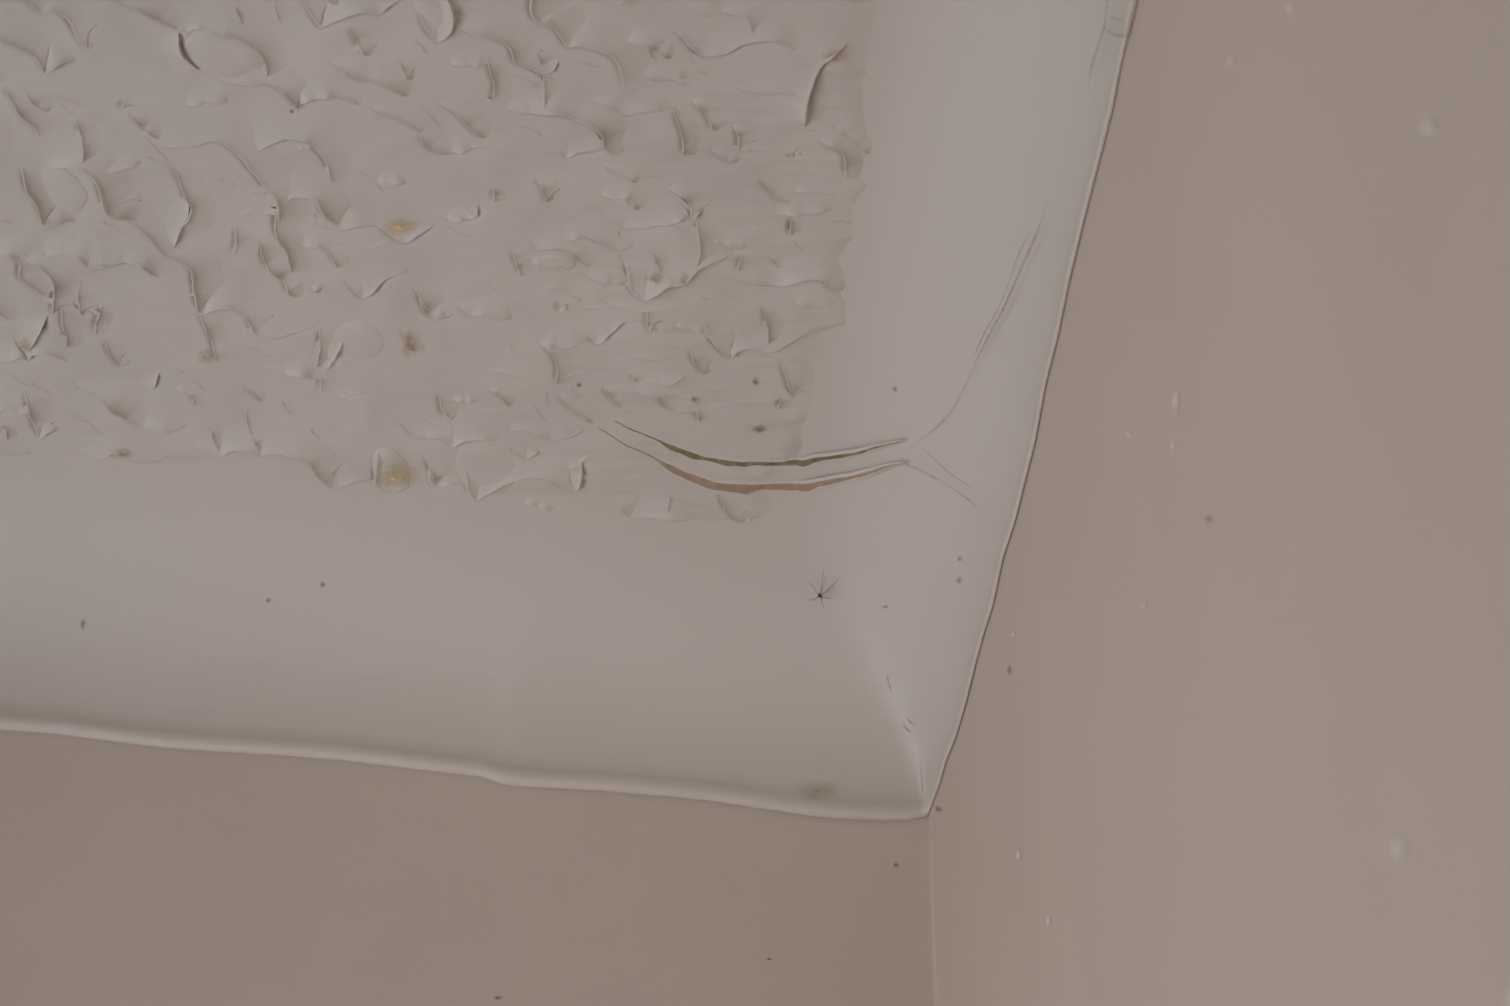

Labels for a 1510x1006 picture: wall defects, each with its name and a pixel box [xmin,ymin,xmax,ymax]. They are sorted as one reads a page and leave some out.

crack [598,420,902,496]